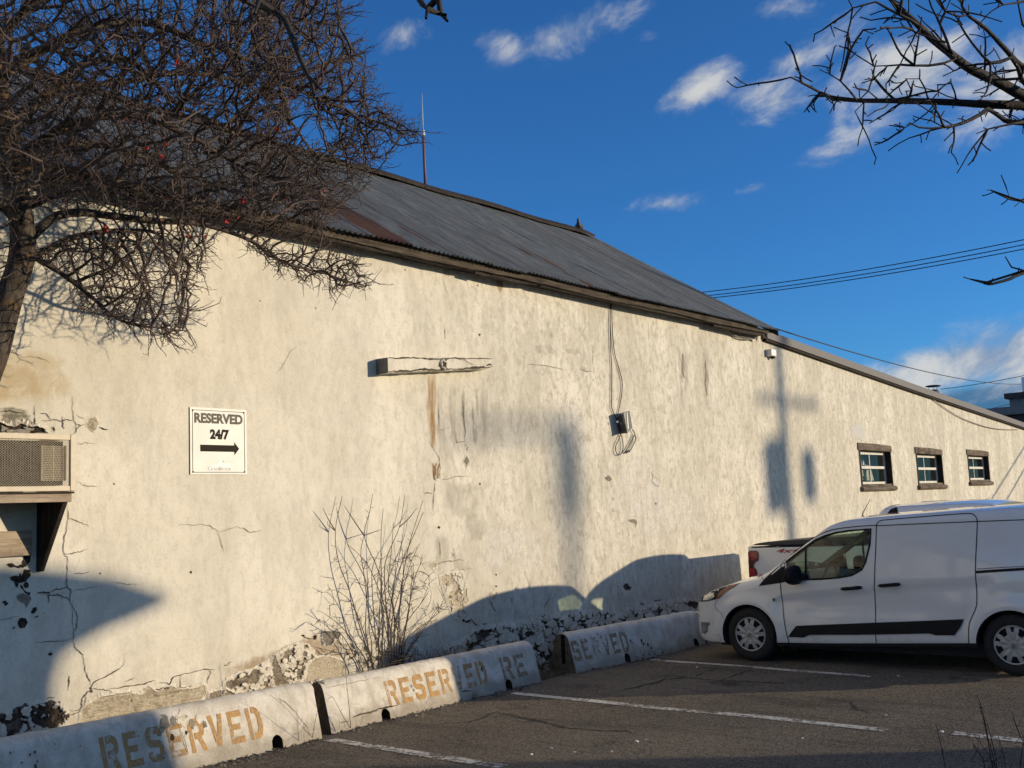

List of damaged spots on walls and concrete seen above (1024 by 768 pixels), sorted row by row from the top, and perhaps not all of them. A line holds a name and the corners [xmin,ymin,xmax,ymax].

spalling [0,419,56,440]
spalling [85,415,108,433]
peeling [2,555,45,629]
crack [36,507,229,723]
peeling [428,560,700,666]
spalling [0,629,425,741]